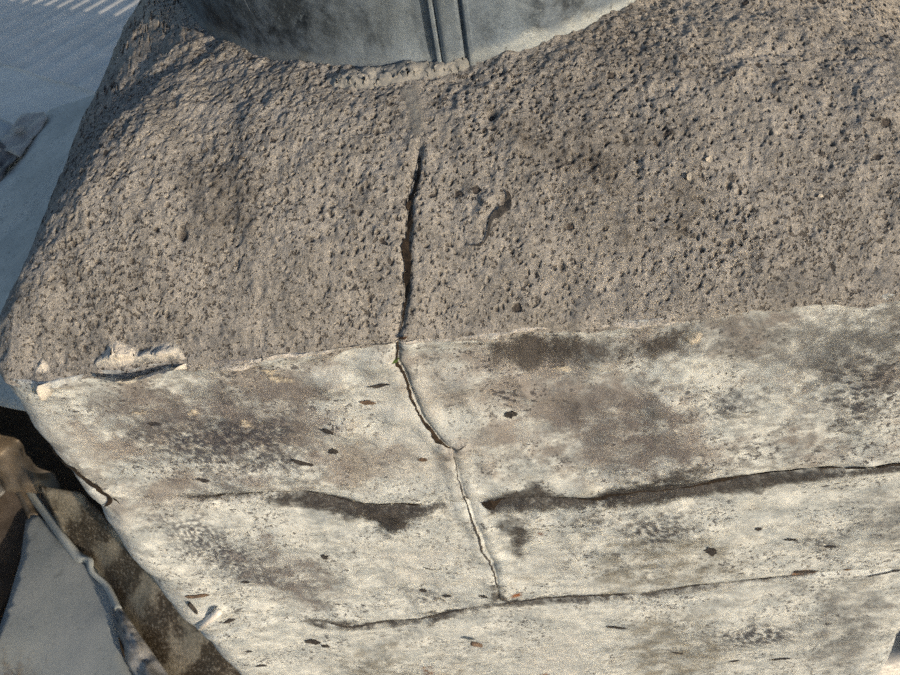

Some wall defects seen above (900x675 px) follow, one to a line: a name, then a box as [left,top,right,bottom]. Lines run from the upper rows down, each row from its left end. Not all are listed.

crack [216,155,734,628]
crack [575,464,900,501]